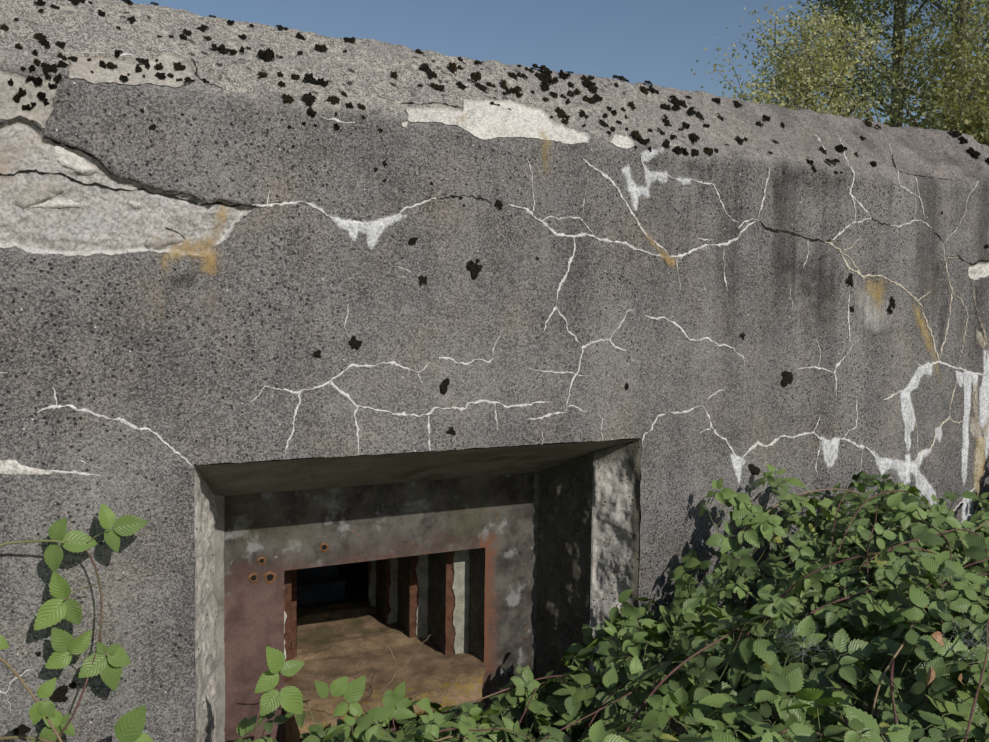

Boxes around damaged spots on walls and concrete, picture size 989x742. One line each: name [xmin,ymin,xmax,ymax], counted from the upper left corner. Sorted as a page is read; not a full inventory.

spalling [0,51,256,257]
crack [302,109,355,124]
spalling [401,98,591,144]
spalling [610,134,635,149]
water stain [622,148,691,209]
water stain [332,214,406,250]
spalling [968,262,989,280]
crack [0,134,989,489]
water stain [874,365,936,505]
water stain [956,330,989,524]
rust [974,437,985,497]